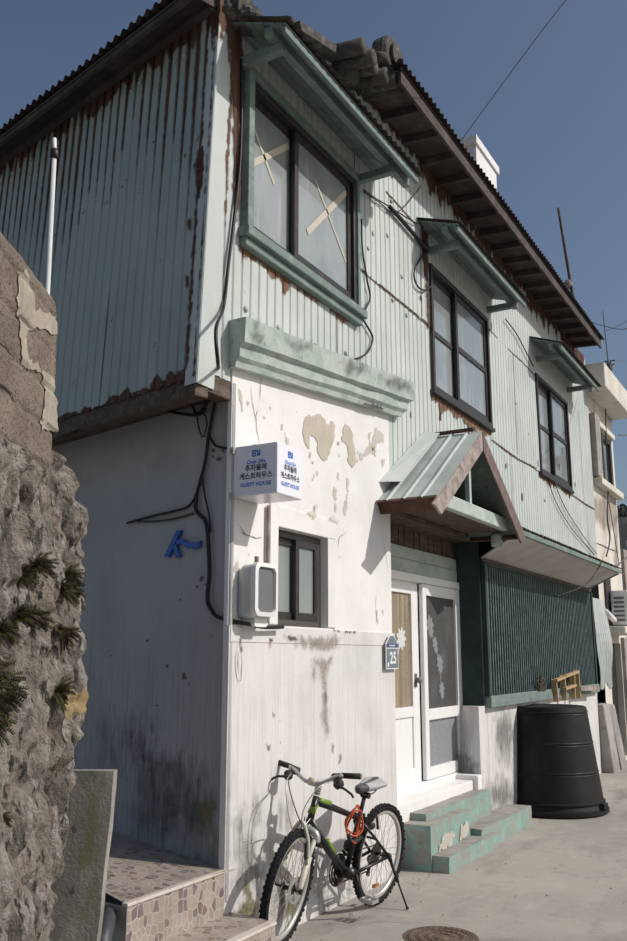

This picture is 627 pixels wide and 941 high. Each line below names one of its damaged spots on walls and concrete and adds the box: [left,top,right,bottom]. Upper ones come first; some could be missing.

rust [0,0,244,422]
rust [239,245,348,323]
rust [368,101,585,365]
peeling [296,412,385,523]
rust [431,394,491,436]